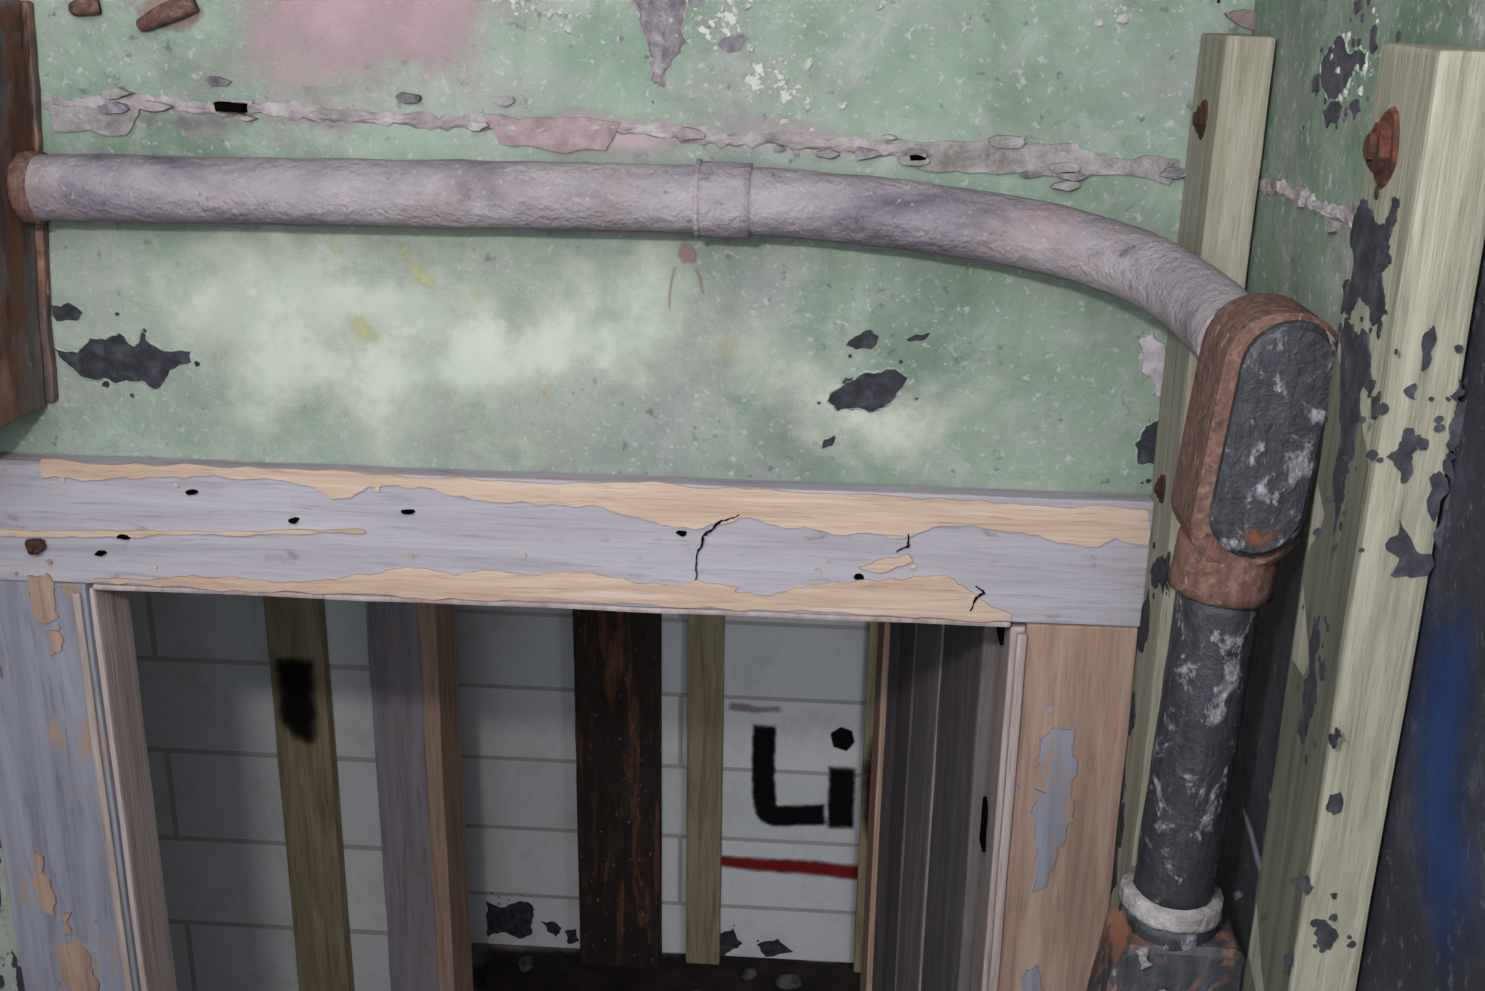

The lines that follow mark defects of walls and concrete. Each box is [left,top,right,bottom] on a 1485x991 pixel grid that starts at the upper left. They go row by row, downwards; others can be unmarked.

peeling [619,0,703,104]
peeling [1312,0,1380,130]
spalling [41,76,1186,191]
peeling [51,302,82,321]
peeling [54,312,200,398]
peeling [817,330,918,413]
peeling [0,456,1170,653]
peeling [1128,692,1136,736]
peeling [1297,604,1342,764]
peeling [1326,792,1343,816]
rust [1109,909,1131,962]
peeling [1289,875,1357,953]